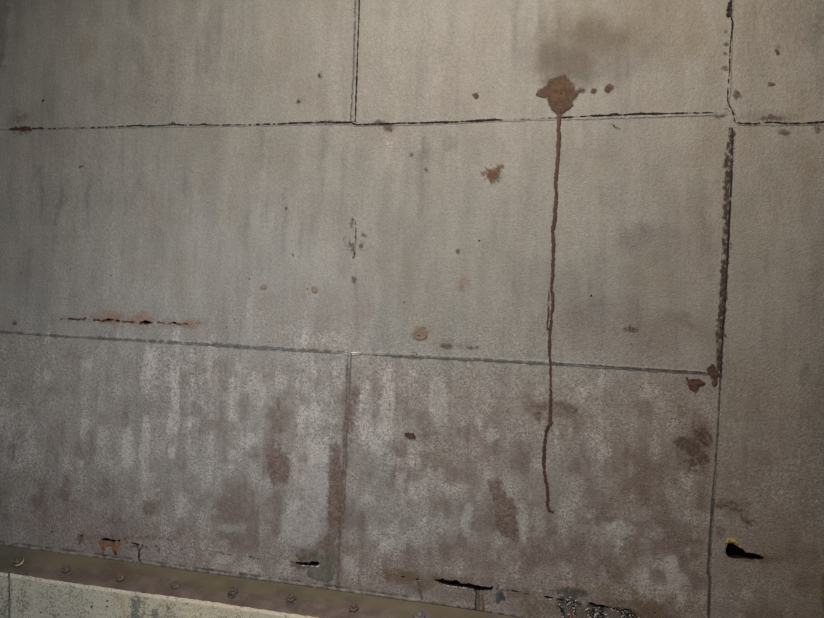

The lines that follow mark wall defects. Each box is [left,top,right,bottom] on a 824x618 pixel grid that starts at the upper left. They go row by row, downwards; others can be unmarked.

rust [482,164,504,184]
rust [715,131,735,379]
rust [533,75,614,513]
rust [686,376,706,392]
damp [296,549,335,582]
spalling [726,543,764,560]
damp [556,587,640,618]